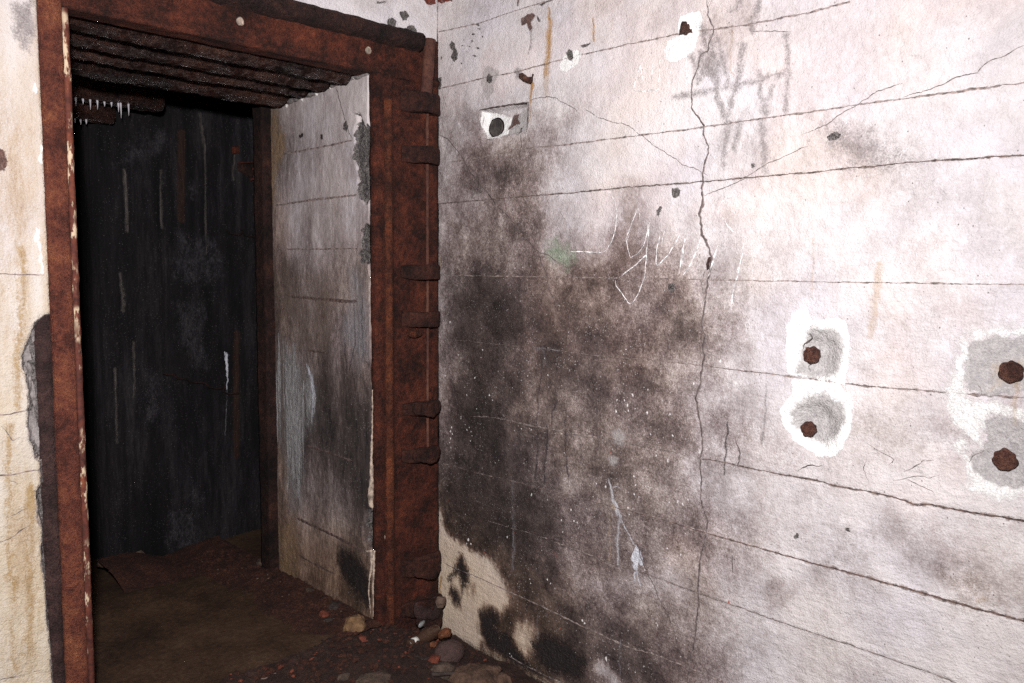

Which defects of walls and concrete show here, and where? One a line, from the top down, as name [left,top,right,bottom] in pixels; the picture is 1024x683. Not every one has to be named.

corrosion [517,0,551,74]
crack [438,134,557,305]
crack [529,0,1022,683]
spalling [779,309,854,458]
flaking render [21,314,54,683]
corrosion [412,550,443,628]
damp [608,480,643,586]